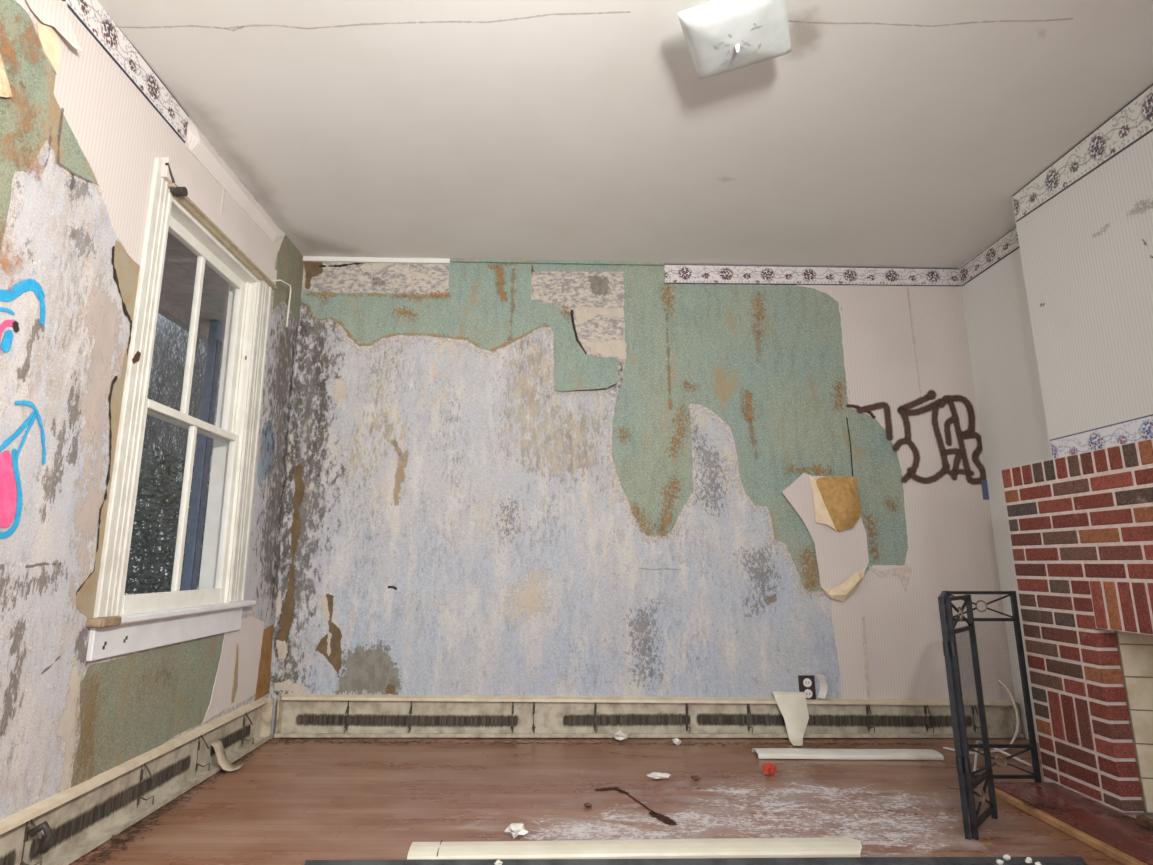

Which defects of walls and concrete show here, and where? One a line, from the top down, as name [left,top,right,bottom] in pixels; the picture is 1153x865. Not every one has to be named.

rust [0,236,22,290]
spalling [303,262,450,294]
spalling [532,271,627,360]
rust [742,390,755,421]
peeling [69,273,141,605]
water stain [253,299,345,698]
rust [633,479,680,538]
rust [786,464,835,477]
peeling [276,640,288,660]
peeling [316,594,342,673]
water stain [336,640,401,695]
peeling [55,628,90,793]